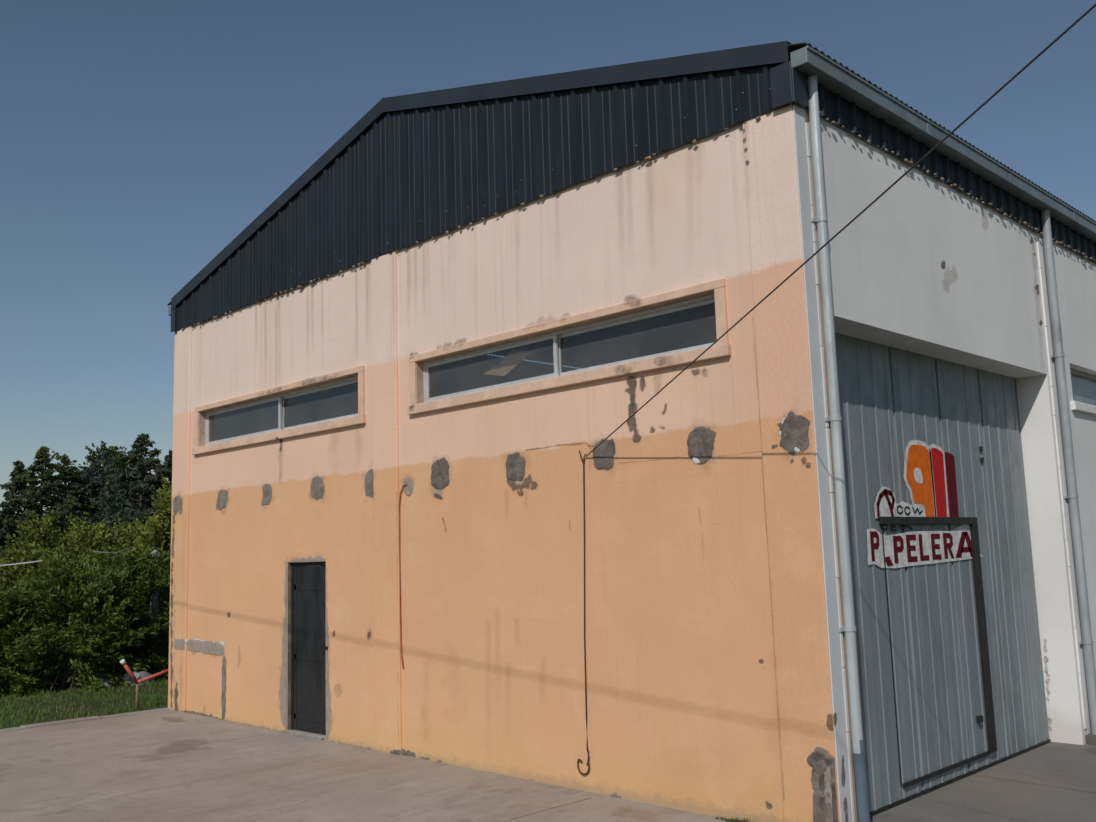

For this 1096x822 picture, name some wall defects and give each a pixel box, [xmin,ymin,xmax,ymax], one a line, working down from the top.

peeling [170,515,225,718]
spalling [807,747,848,822]